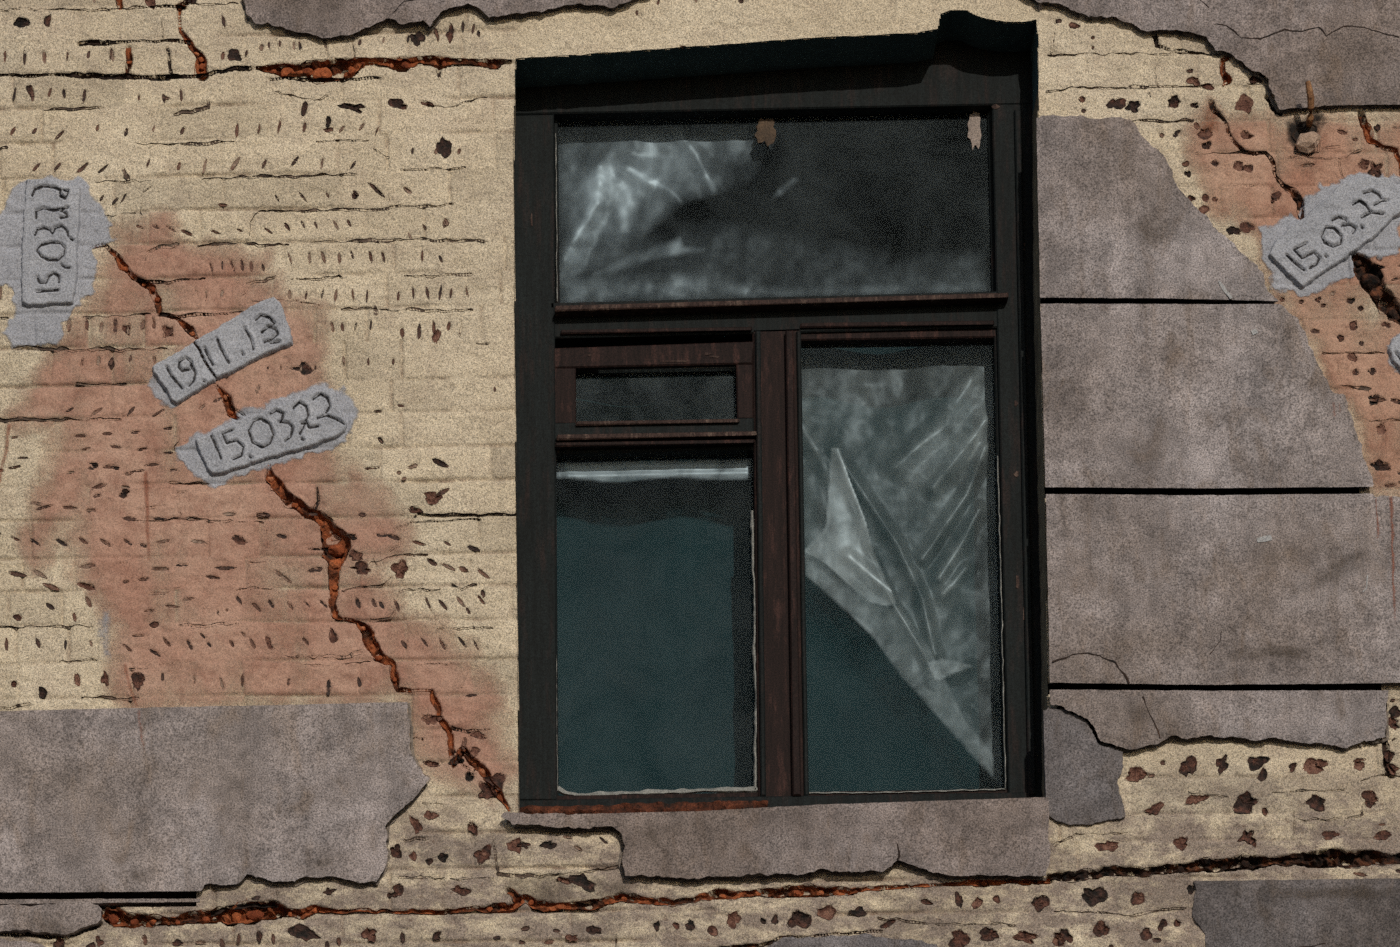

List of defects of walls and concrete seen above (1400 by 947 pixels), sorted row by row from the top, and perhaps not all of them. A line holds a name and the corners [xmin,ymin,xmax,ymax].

crack [0,0,512,422]
peeling [1358,152,1394,178]
spalling [88,405,177,498]
spalling [152,278,187,337]
peeling [291,362,316,375]
crack [1323,253,1400,422]
spalling [1337,257,1400,375]
spalling [1346,399,1400,497]
peeling [1368,394,1400,406]
peeling [131,672,145,696]
crack [1,464,1400,947]
spalling [934,683,1400,881]